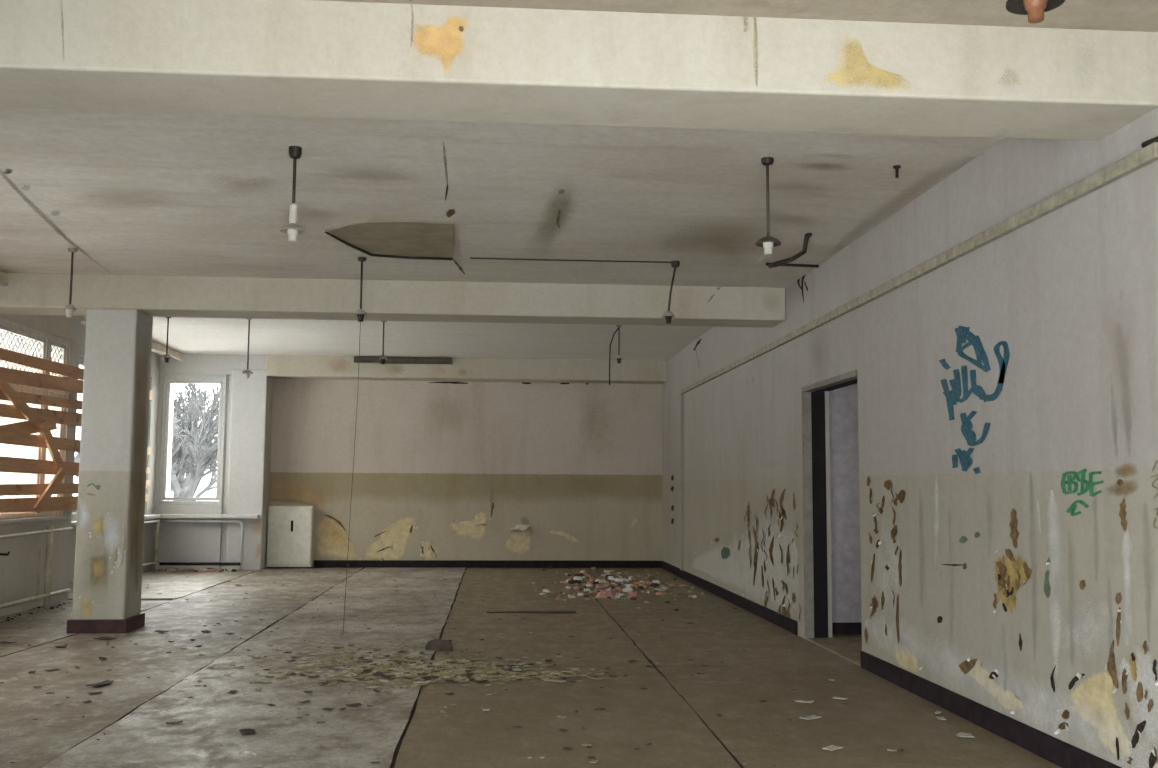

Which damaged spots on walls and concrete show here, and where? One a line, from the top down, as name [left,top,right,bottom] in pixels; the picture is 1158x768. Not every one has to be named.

spalling [317,513,440,566]
peeling [714,489,801,621]
peeling [864,476,922,672]
spalling [993,508,1050,613]
peeling [958,657,1023,715]
spalling [1050,592,1158,768]